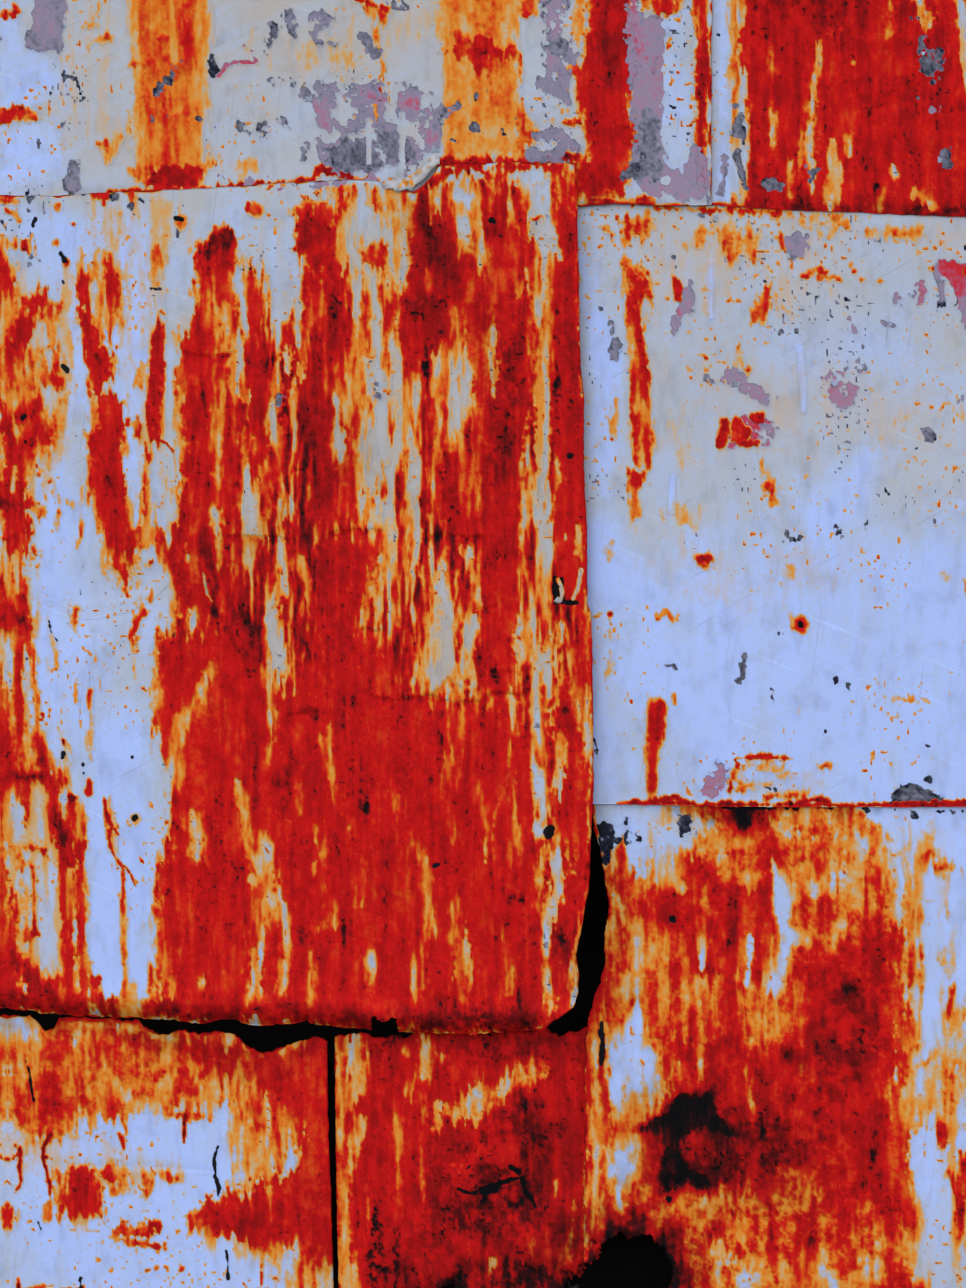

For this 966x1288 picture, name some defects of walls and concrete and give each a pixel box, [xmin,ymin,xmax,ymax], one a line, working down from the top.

peeling [24,0,68,55]
peeling [263,8,338,56]
peeling [267,77,449,193]
peeling [536,0,582,107]
rust [563,0,656,206]
peeling [620,0,718,224]
rust [683,0,966,269]
rust [620,253,659,521]
peeling [890,259,966,331]
rust [75,0,593,1034]
rust [336,696,966,1288]
rust [7,1016,332,1288]